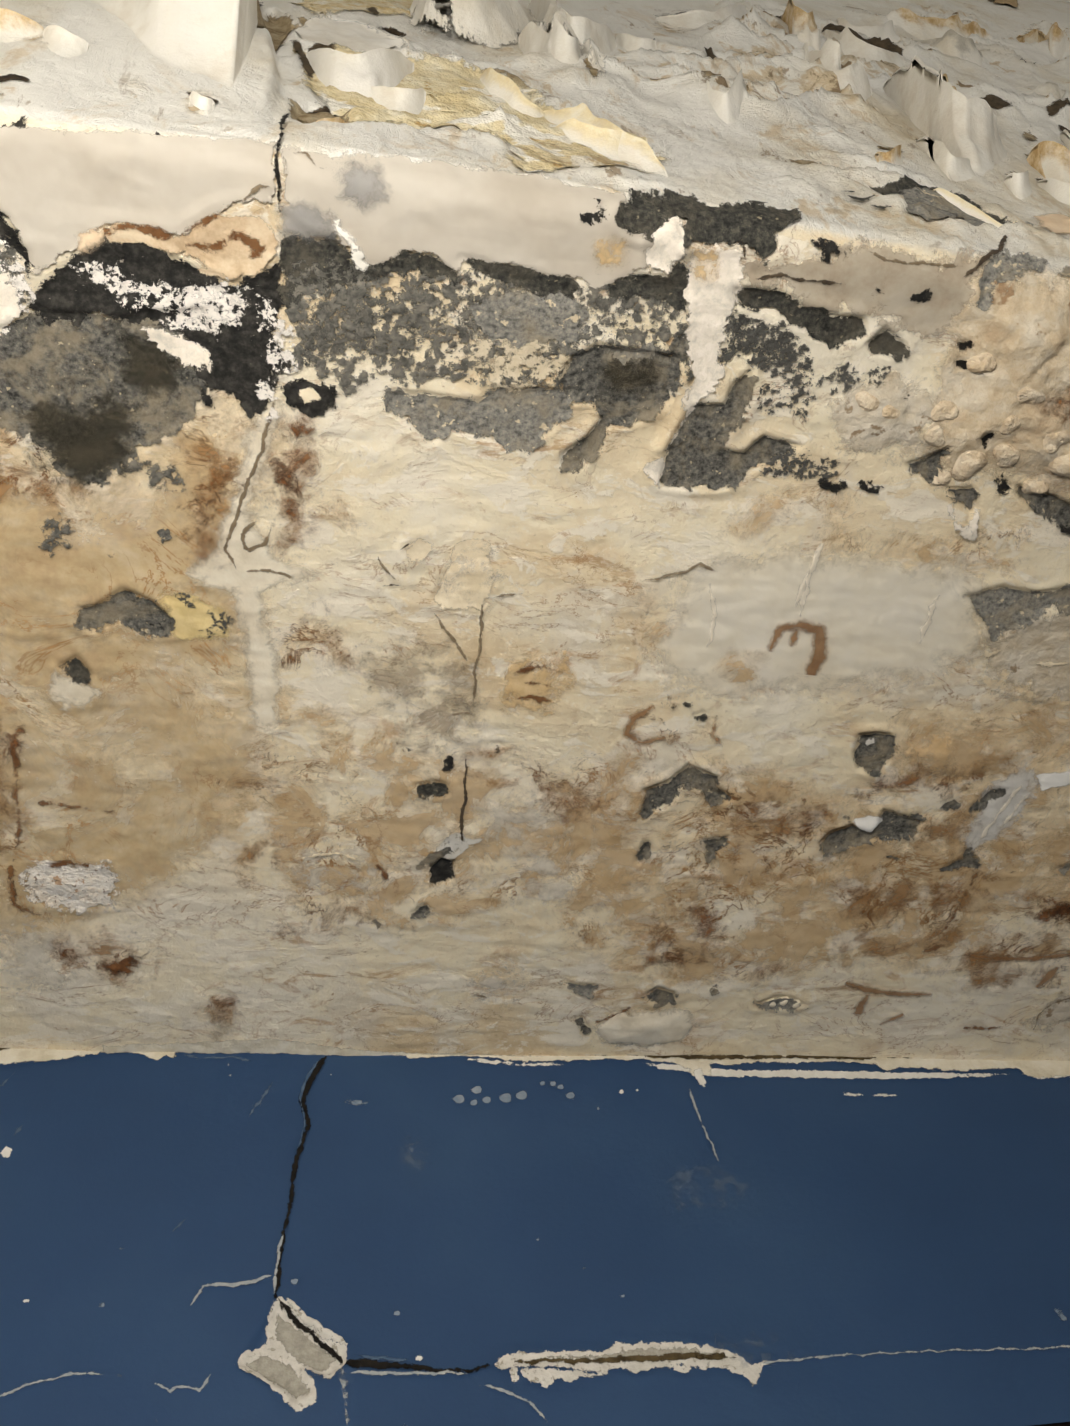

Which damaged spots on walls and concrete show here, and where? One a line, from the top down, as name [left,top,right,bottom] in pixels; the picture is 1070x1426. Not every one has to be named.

peeling [90,0,426,115]
damp [590,155,628,166]
peeling [776,0,1070,234]
spalling [0,68,1070,495]
damp [0,209,1070,989]
crack [191,1054,327,1305]
crack [0,1372,120,1396]
crack [155,1374,211,1393]
flaking render [238,1294,349,1424]
crack [345,1355,545,1418]
flaking render [494,1340,769,1388]
crack [765,1345,1070,1364]